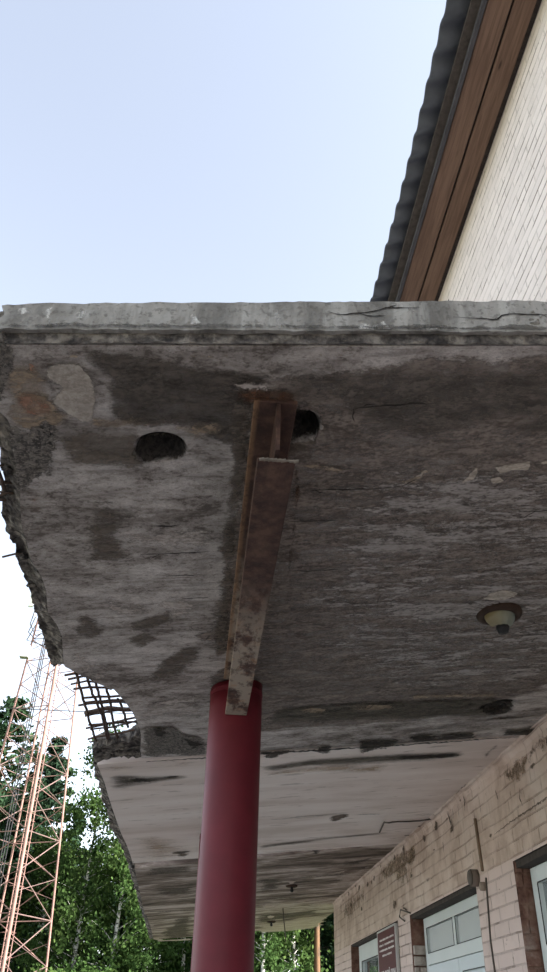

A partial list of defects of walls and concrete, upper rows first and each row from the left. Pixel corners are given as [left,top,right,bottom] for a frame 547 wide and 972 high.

crack [331,305,419,316]
crack [461,312,547,320]
spalling [0,310,547,401]
peeling [491,461,547,483]
rust [214,383,294,656]
water stain [56,351,547,735]
spalling [0,413,207,941]
water stain [268,753,459,774]
peeling [260,728,535,758]
water stain [506,740,547,781]
water stain [381,848,415,883]
peeling [257,900,335,932]